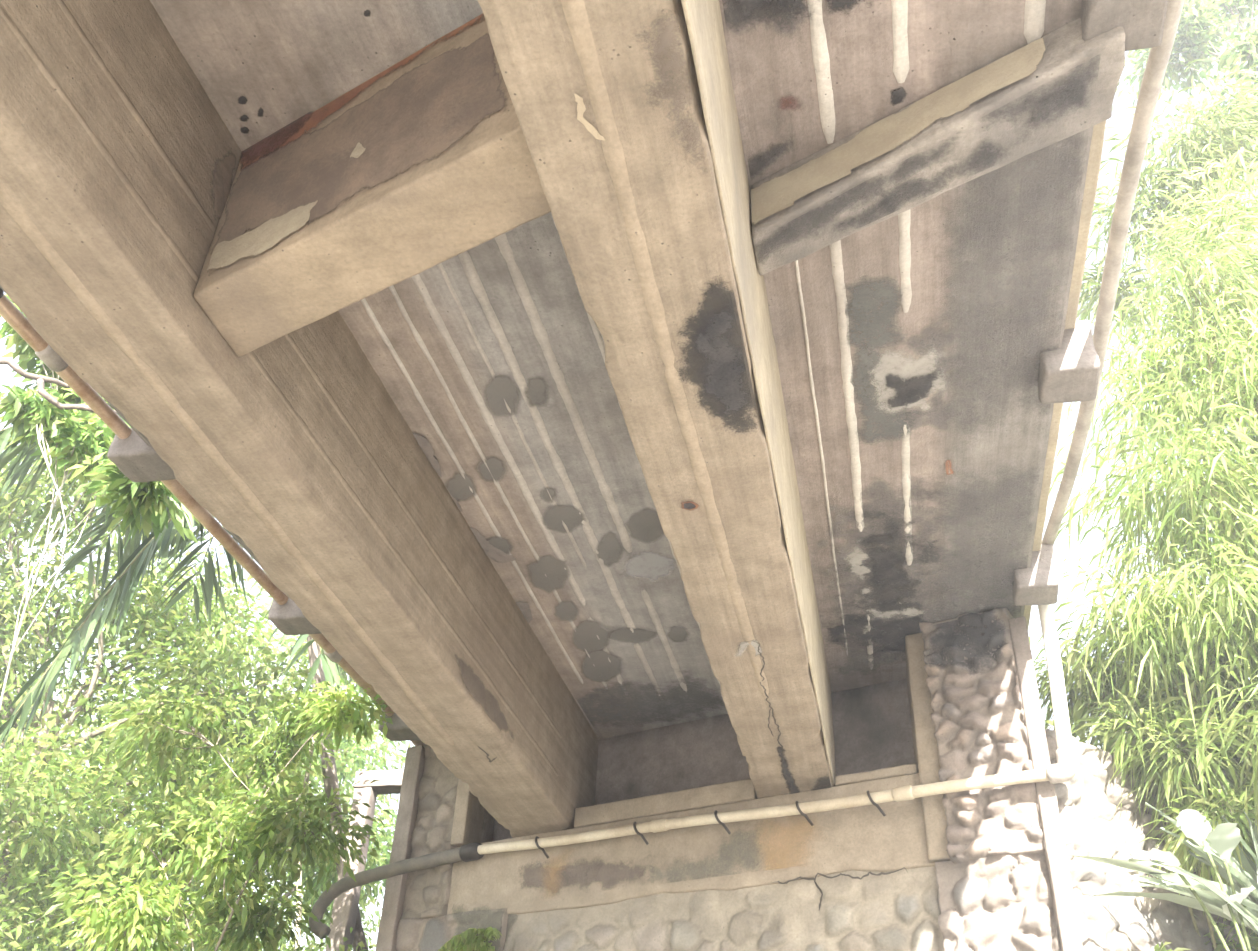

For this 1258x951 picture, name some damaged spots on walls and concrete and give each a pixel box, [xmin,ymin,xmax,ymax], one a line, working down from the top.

water stain [723,0,809,32]
peeling [206,33,506,270]
water stain [486,376,547,416]
water stain [678,276,758,433]
hole [869,328,948,428]
water stain [758,135,1080,443]
water stain [528,556,720,727]
water stain [597,509,674,580]
crack [736,640,800,794]
water stain [824,475,1034,673]
water stain [521,830,758,893]
crack [772,867,908,910]